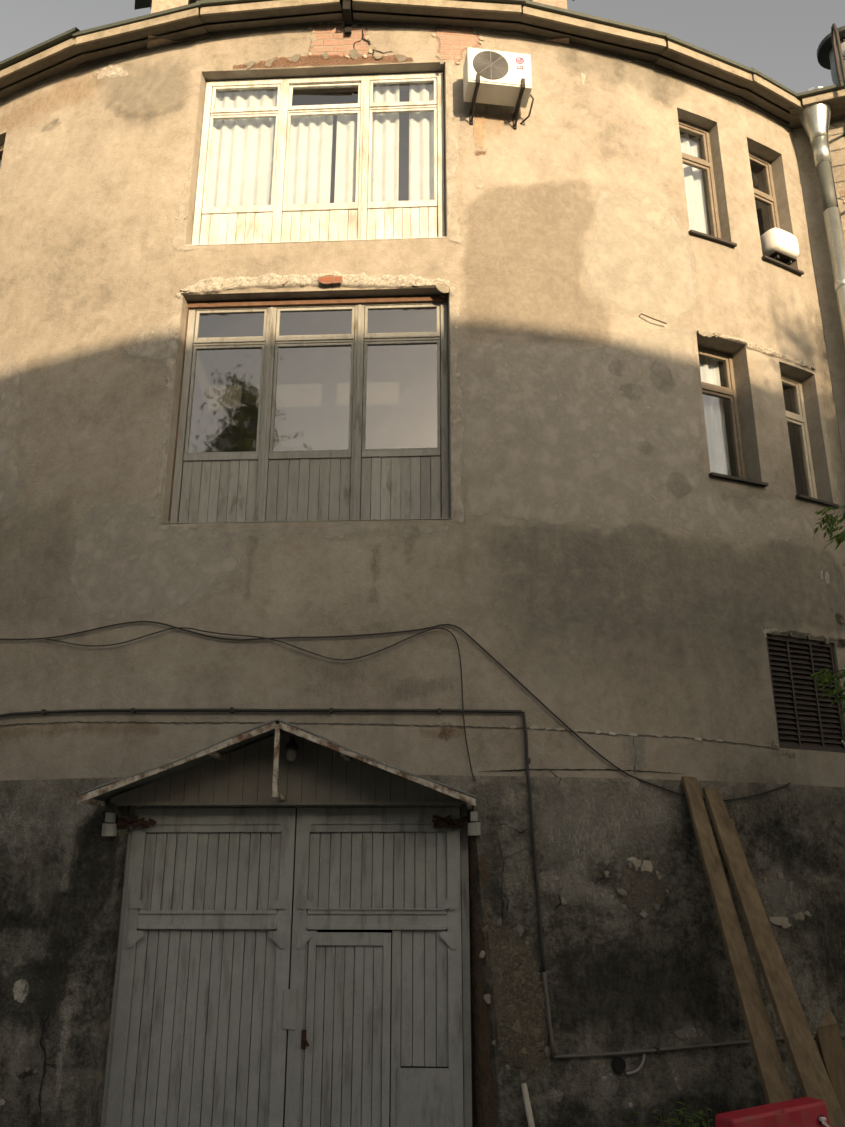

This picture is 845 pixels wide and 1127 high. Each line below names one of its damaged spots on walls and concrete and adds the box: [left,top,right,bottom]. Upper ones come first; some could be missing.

flaking render [265,20,407,68]
flaking render [318,275,343,284]
flaking render [616,857,669,918]
damp [0,792,128,1127]
crack [38,1010,57,1116]